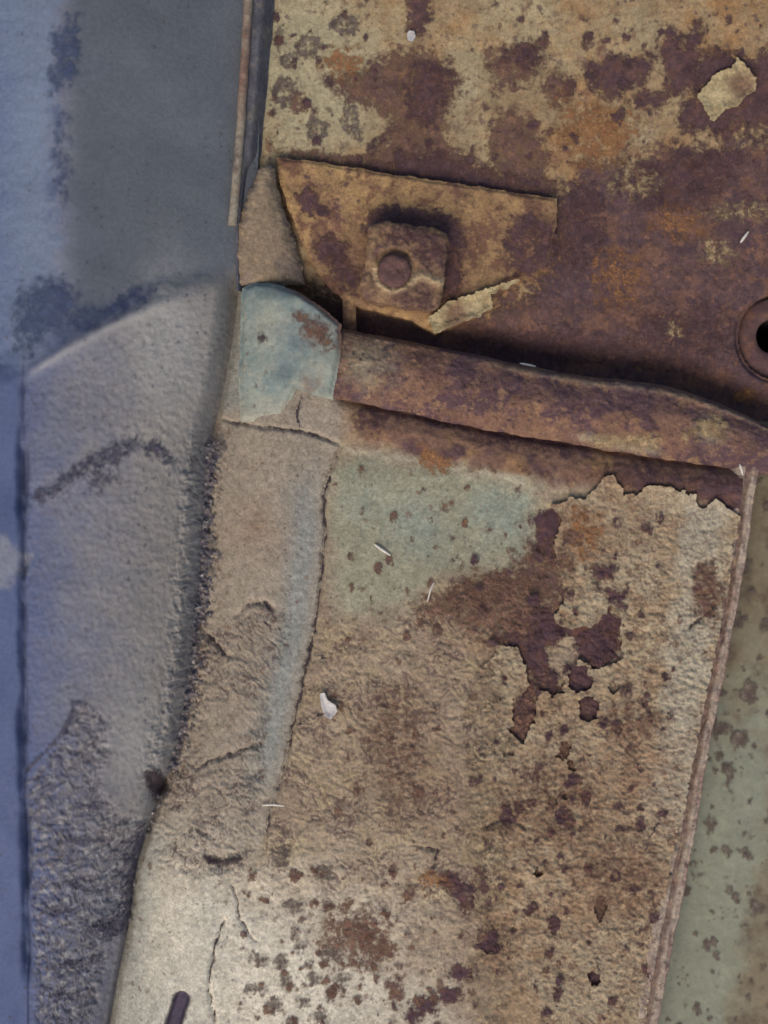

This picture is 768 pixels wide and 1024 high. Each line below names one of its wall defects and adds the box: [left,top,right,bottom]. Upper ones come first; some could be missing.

leakage [46,12,81,96]
peeling [697,57,757,121]
corrosion [268,0,768,421]
leakage [12,277,157,358]
peeling [428,279,520,333]
corrosion [428,419,570,452]
crack [232,397,338,851]
corrosion [402,507,644,647]
peeling [384,475,741,1024]
corrosion [474,740,660,1018]
crack [207,886,252,1022]
corrosion [239,897,415,1024]